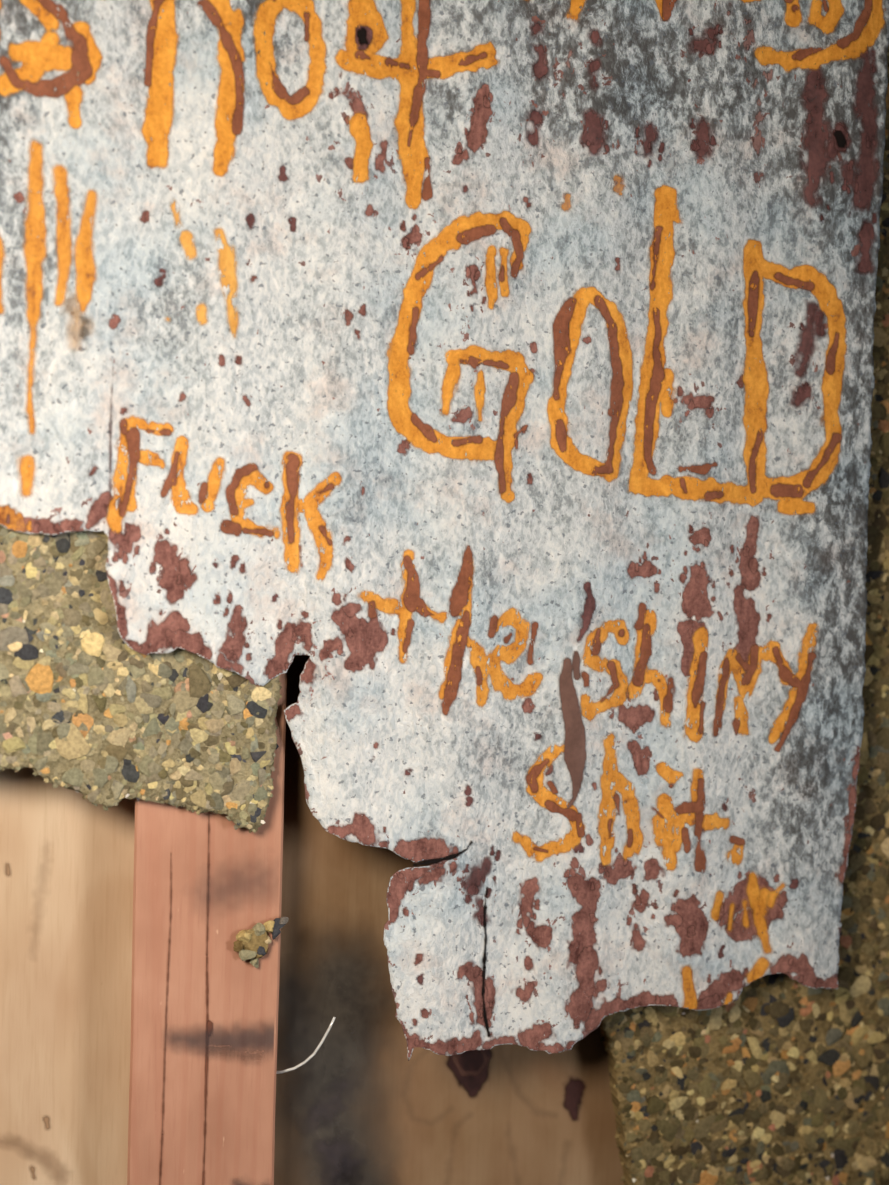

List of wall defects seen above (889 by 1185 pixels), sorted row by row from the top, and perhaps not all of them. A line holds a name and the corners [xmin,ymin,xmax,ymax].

corrosion [797,48,879,273]
corrosion [0,491,252,675]
peeling [0,525,282,833]
corrosion [263,593,395,684]
corrosion [627,551,661,593]
corrosion [677,516,772,677]
peeling [233,917,289,968]
corrosion [327,813,501,926]
crack [413,841,473,866]
crack [482,890,490,1037]
corrosion [400,834,799,1057]
corrosion [770,953,838,989]